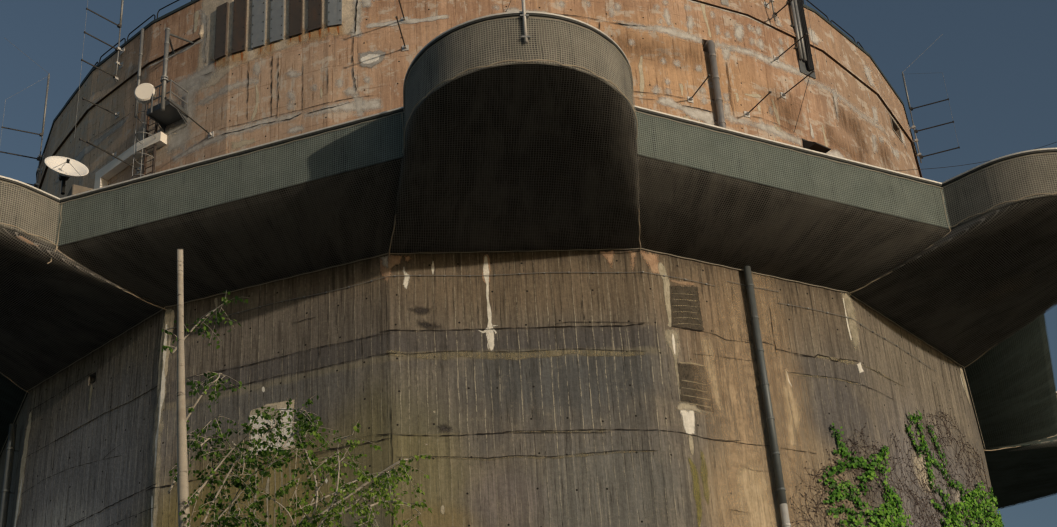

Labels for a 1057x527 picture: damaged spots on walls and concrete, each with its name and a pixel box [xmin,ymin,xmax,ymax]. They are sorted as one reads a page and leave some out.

leakage [479,254,498,351]
leakage [677,287,776,527]
leakage [760,287,802,502]